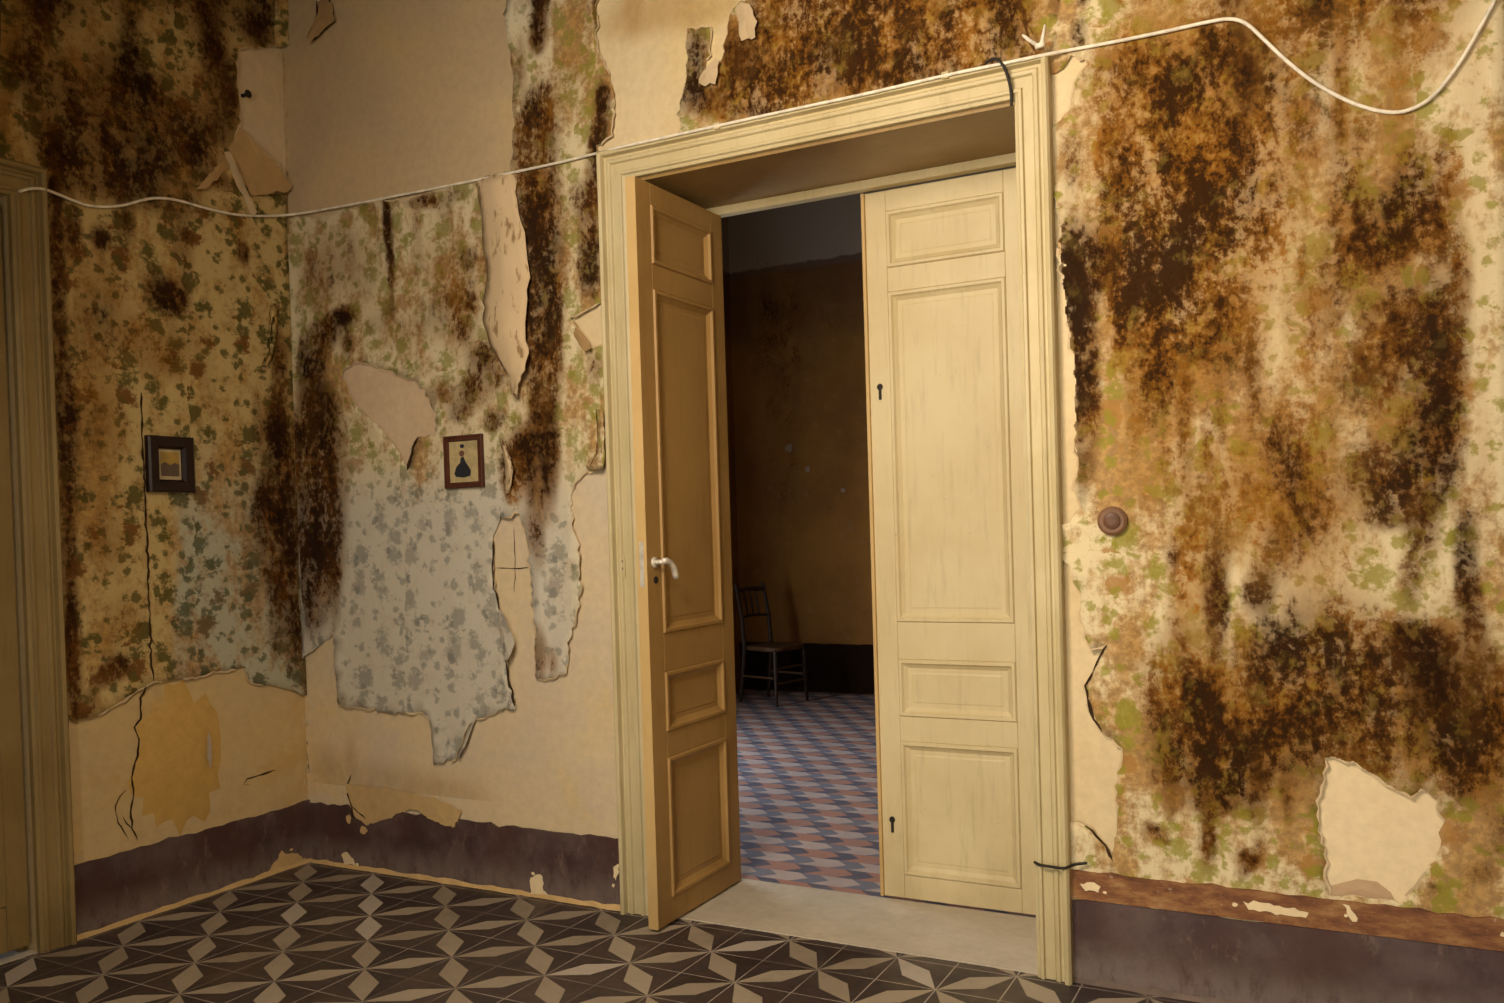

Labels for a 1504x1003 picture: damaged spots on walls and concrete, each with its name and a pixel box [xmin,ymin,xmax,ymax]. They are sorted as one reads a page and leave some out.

damp [8,0,274,716]
damp [245,304,355,672]
peeling [68,409,618,866]
peeling [196,0,530,398]
peeling [342,362,436,466]
damp [432,0,611,557]
peeling [594,0,757,152]
damp [679,0,1049,122]
damp [1057,0,1504,865]
flaking render [1080,882,1107,894]
flaking render [1232,900,1308,918]
peeling [1316,757,1445,922]